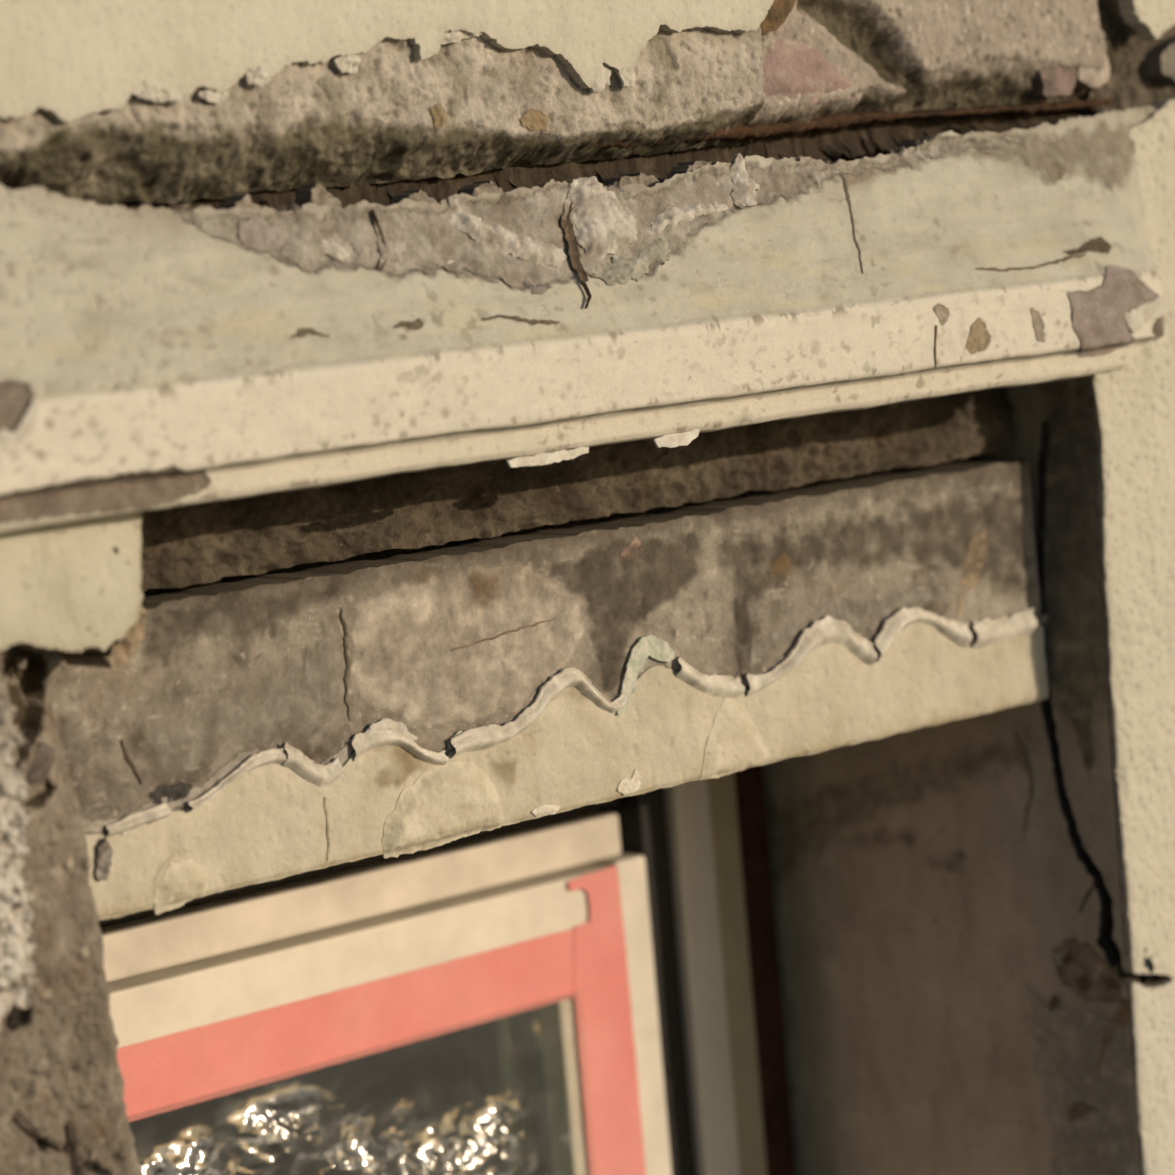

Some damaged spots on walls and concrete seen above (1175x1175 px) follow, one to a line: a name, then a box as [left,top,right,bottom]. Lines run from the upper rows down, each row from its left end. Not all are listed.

flaking render [0,0,1175,309]
crack [97,89,1092,273]
peeling [1064,237,1165,357]
peeling [0,380,38,442]
peeling [0,465,211,523]
spalling [3,649,57,808]
water stain [147,533,699,767]
peeling [83,607,1049,880]
water stain [724,495,1028,664]
crack [1112,934,1162,985]
crack [12,1117,92,1175]